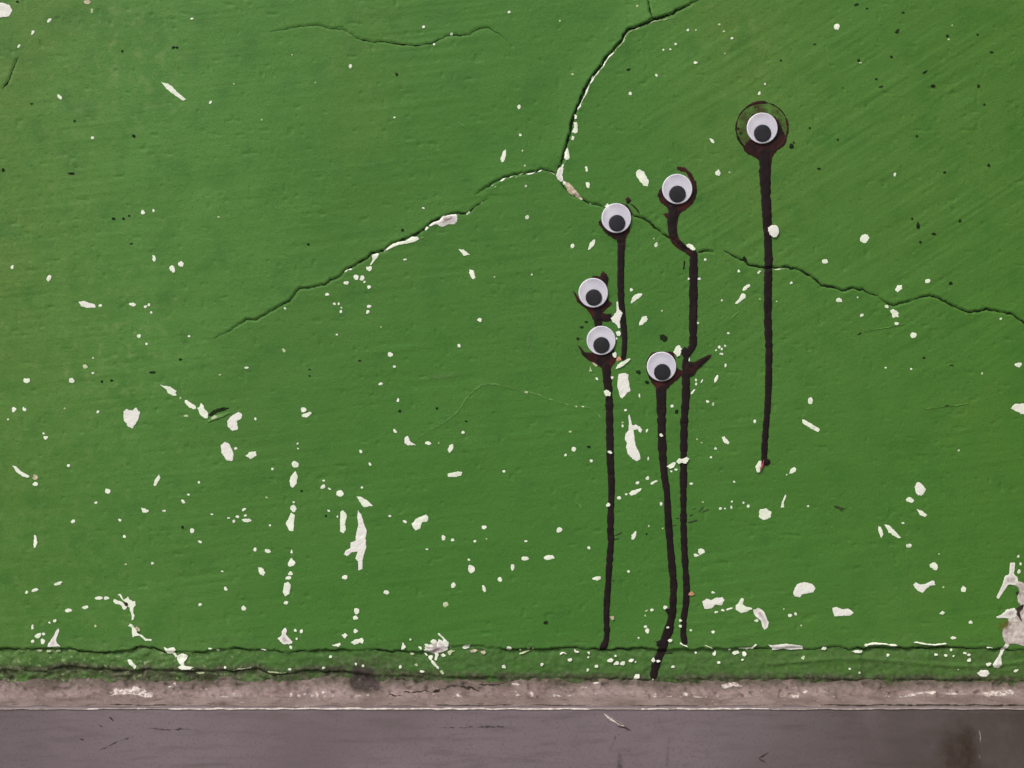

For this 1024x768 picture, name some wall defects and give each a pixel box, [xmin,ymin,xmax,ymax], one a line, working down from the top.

crack [218,0,698,336]
crack [698,250,1024,324]
peeling [123,408,140,428]
peeling [161,385,242,431]
peeling [625,415,642,461]
peeling [340,497,373,579]
peeling [689,591,769,630]
peeling [793,582,815,597]
peeling [977,555,1024,677]
crack [0,646,410,676]
crack [500,645,645,653]
crack [803,644,1022,652]